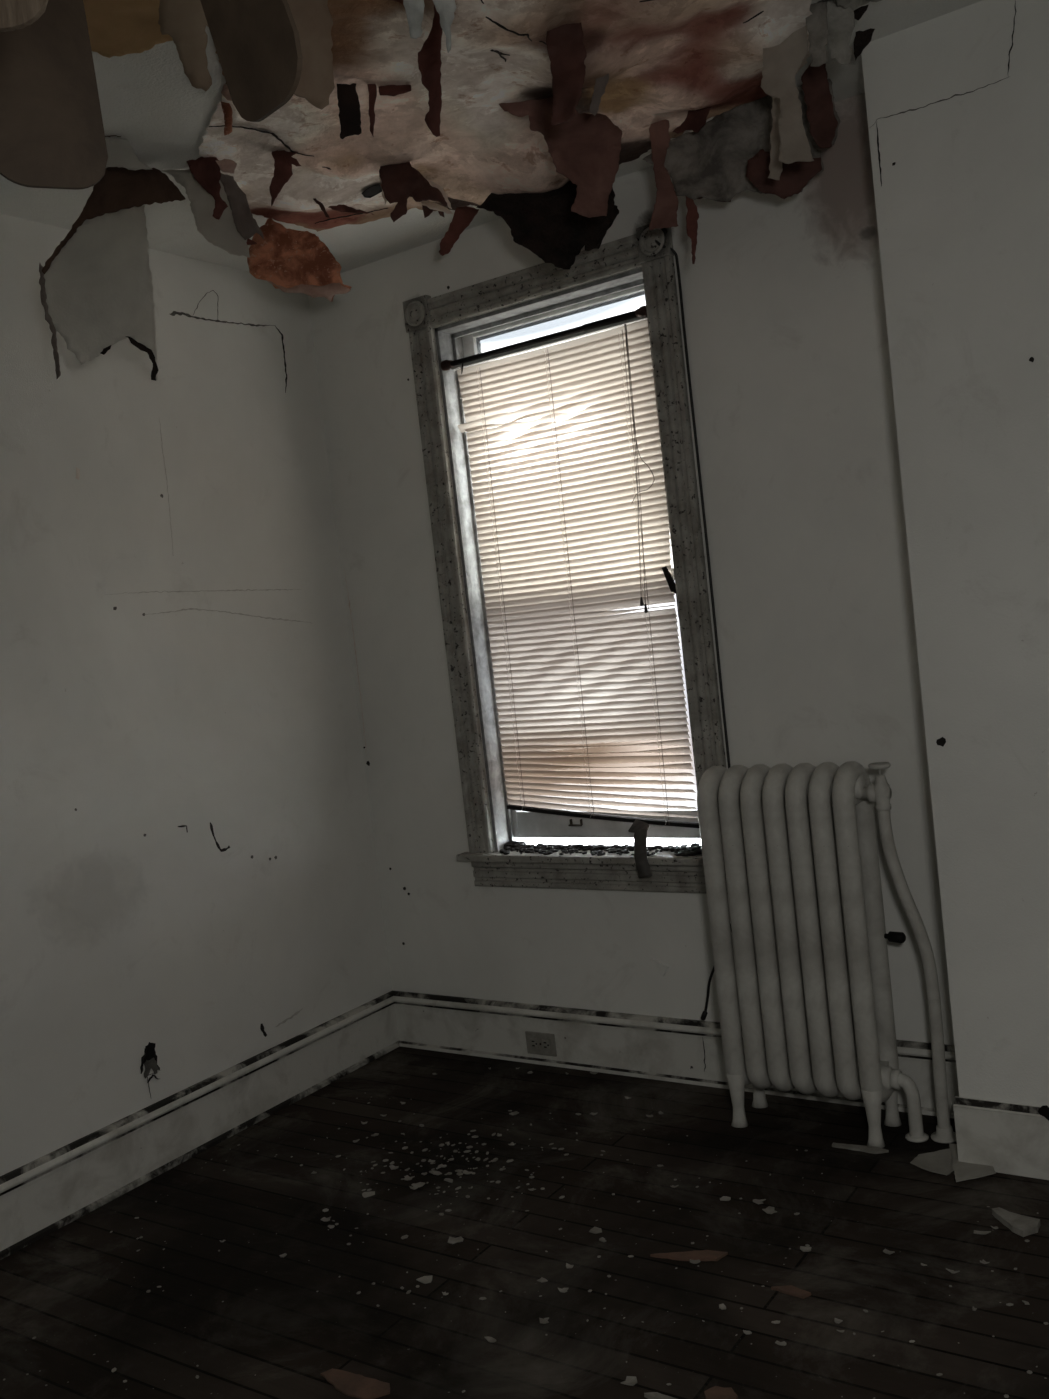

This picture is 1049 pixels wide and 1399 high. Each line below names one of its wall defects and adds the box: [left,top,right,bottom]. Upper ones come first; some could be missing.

flaking render [642,0,881,264]
crack [170,290,287,393]
spalling [140,1042,160,1097]